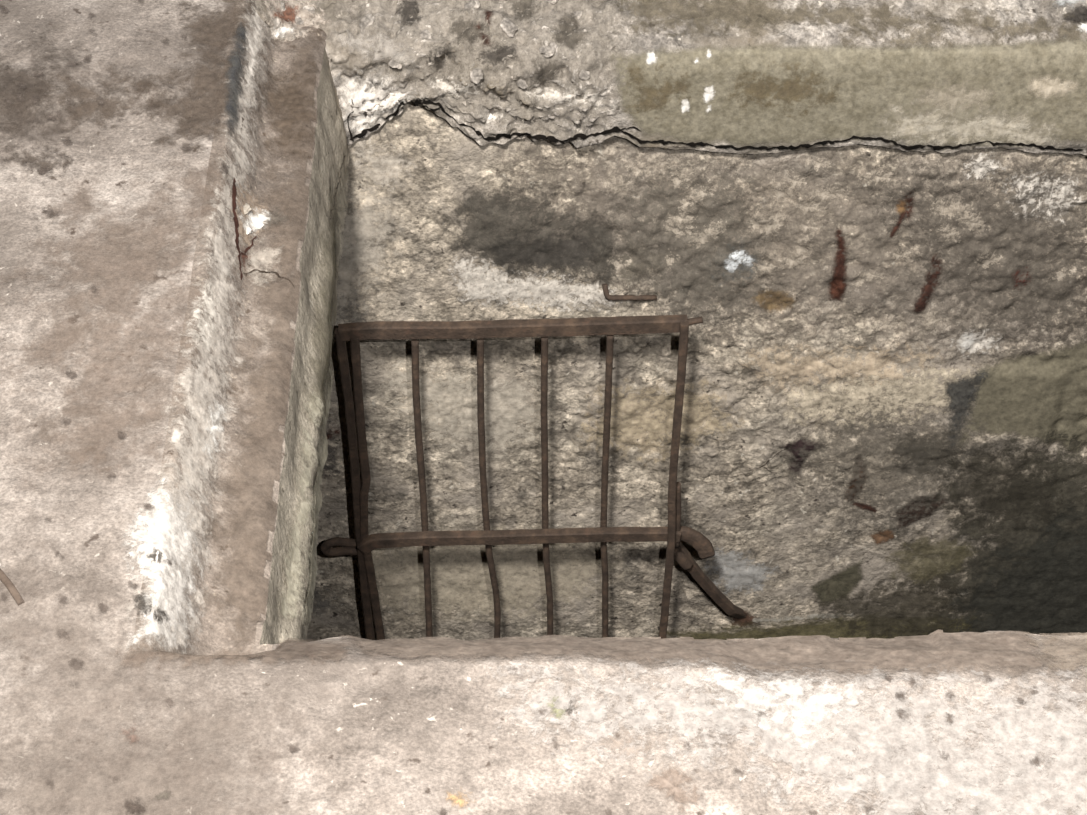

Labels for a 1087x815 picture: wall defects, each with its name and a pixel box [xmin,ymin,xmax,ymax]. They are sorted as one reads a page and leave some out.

water stain [1031,77,1077,97]
crack [329,98,1083,230]
water stain [441,153,849,328]
corrosion [828,230,846,300]
corrosion [890,192,913,237]
water stain [742,87,1087,429]
corrosion [914,255,942,313]
water stain [705,548,775,594]
water stain [753,445,1087,638]